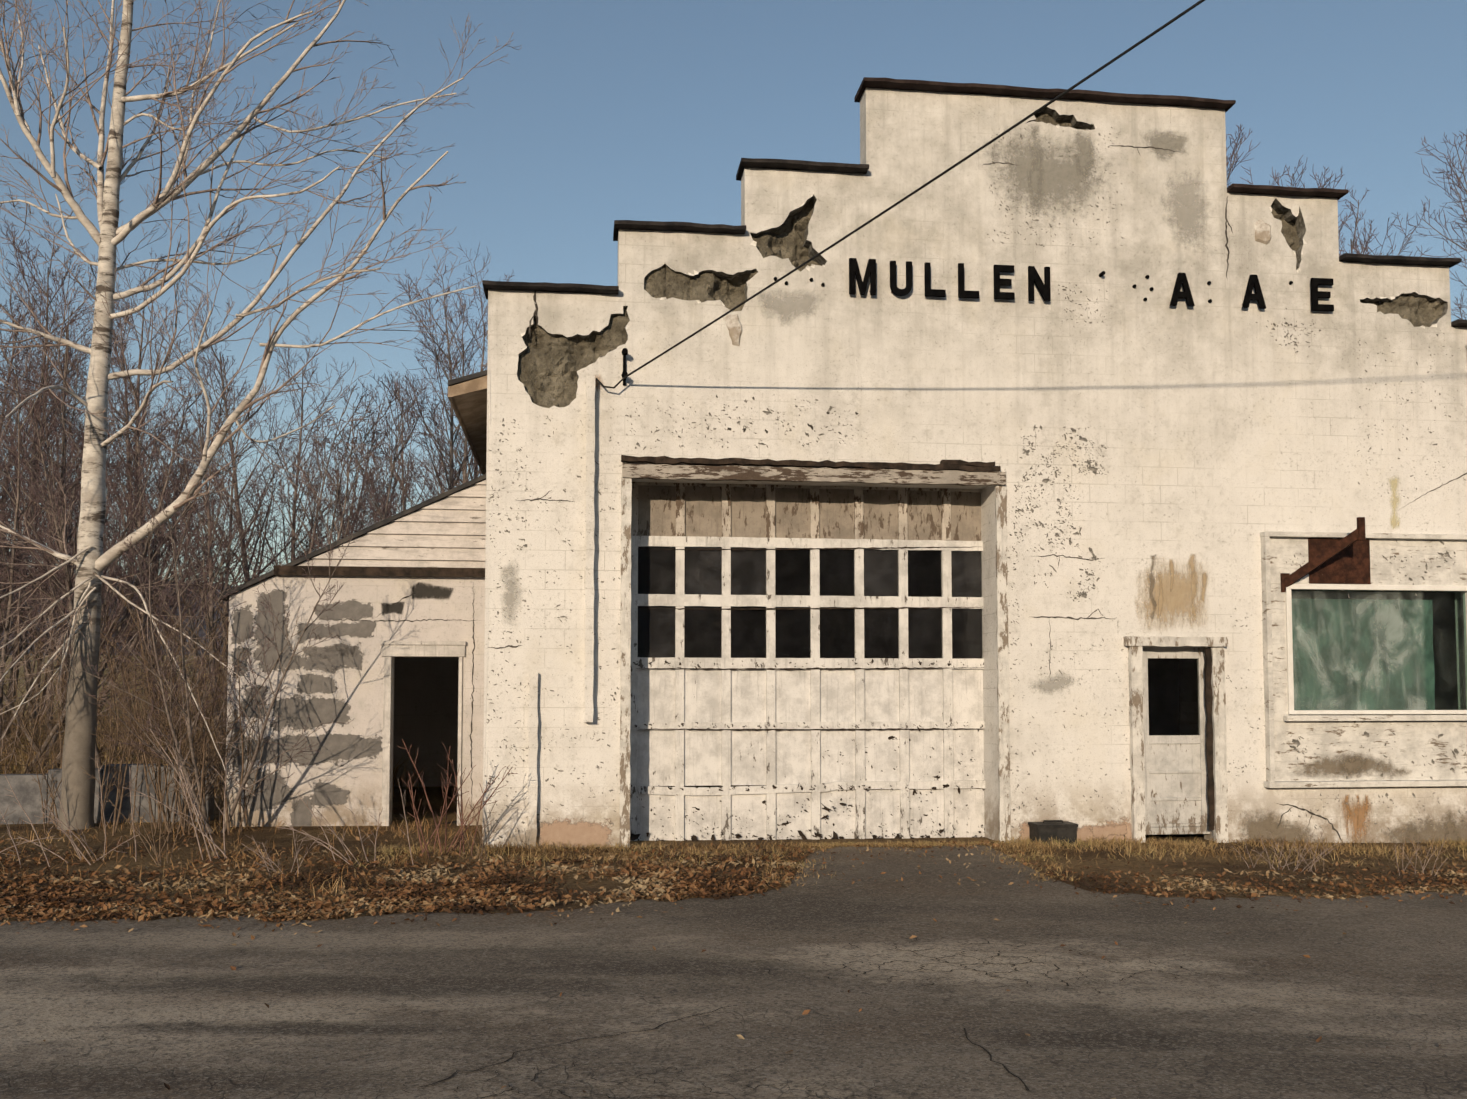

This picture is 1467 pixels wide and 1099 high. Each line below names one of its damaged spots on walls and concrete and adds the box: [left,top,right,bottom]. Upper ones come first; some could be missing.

spalling [644,193,827,312]
leakage [992,128,1101,214]
spalling [987,107,1123,247]
spalling [1269,198,1307,272]
spalling [1353,292,1461,501]
spalling [485,301,985,848]
peeling [1008,425,1121,842]
corrosion [1144,555,1207,623]
crack [376,1062,876,1099]